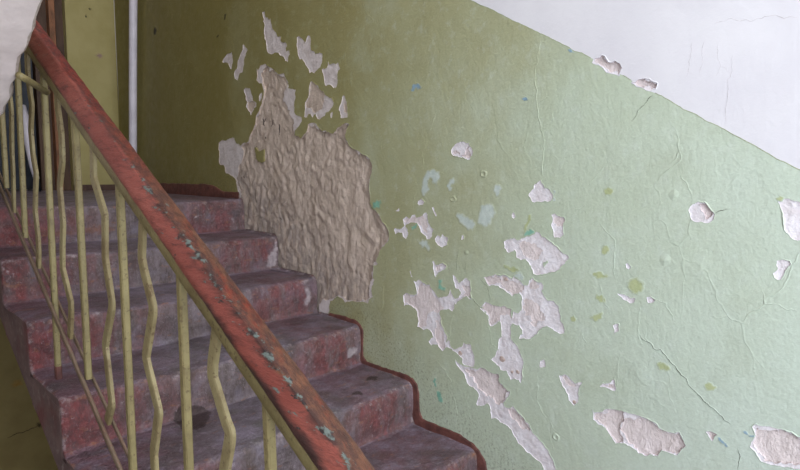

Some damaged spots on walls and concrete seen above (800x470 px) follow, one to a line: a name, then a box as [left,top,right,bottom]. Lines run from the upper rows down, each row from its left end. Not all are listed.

spalling [592,54,623,76]
spalling [631,77,658,92]
spalling [218,11,569,470]
peeling [688,201,715,224]
peeling [777,198,800,241]
peeling [559,374,583,406]
crack [639,334,731,424]
spalling [592,408,687,457]
spalling [749,423,800,470]